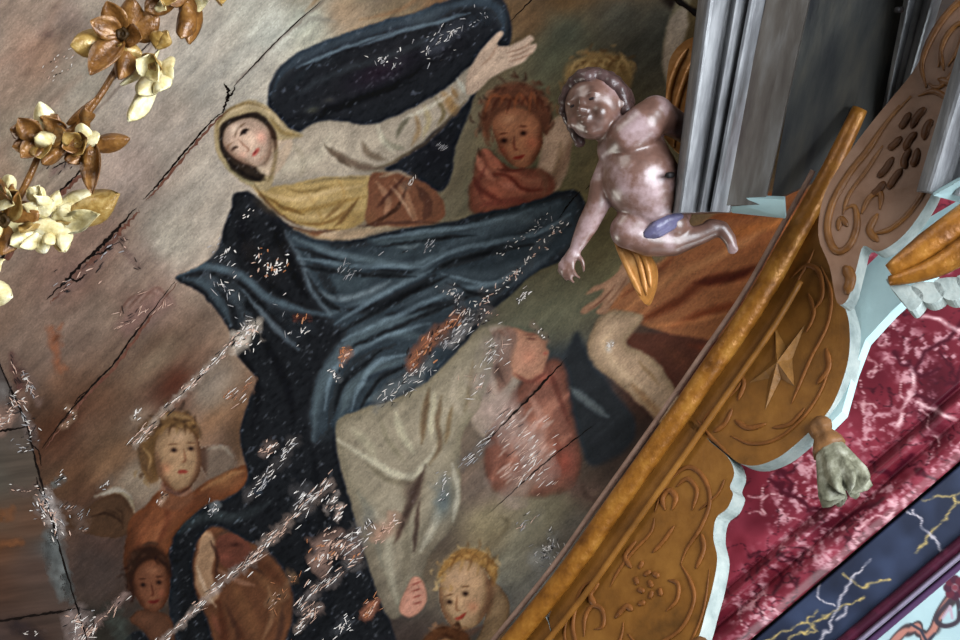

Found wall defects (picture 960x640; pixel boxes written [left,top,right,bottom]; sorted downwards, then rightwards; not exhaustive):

crack [47,2,320,303]
peeling [128,236,261,446]
peeling [250,247,290,277]
peeling [378,206,569,408]
peeling [0,355,42,453]
crack [484,363,562,445]
peeling [10,469,89,542]
crack [0,282,176,640]
peeling [248,437,298,498]
crack [494,427,591,509]
peeling [155,470,401,640]
peeling [63,594,131,640]